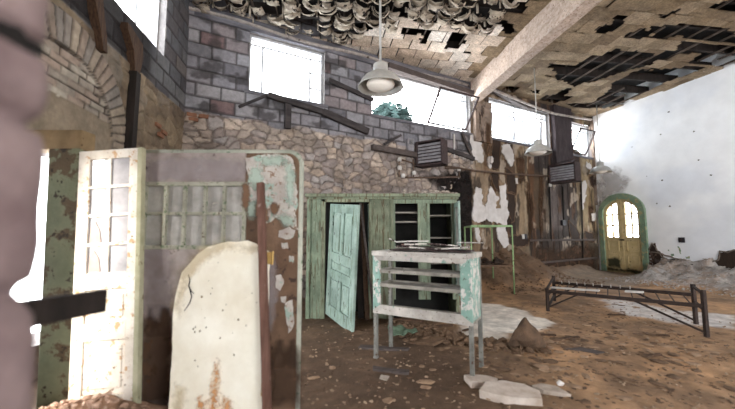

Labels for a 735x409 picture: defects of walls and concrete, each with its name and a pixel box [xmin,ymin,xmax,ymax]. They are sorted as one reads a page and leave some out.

flaking render [469,135,529,248]
flaking render [572,149,596,221]